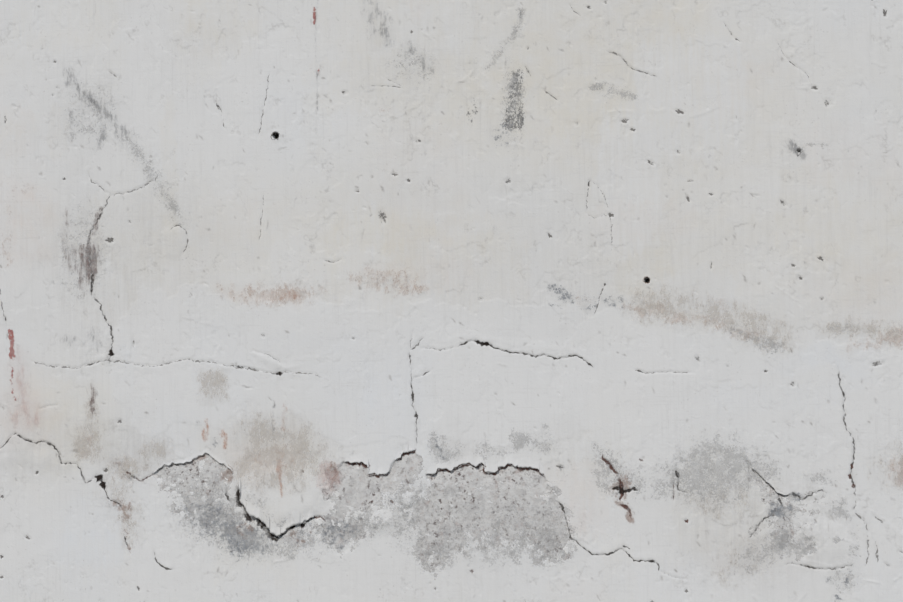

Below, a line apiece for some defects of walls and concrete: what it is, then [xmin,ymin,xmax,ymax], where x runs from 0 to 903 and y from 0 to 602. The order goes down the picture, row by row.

crack [35,178,311,375]
crack [409,340,593,438]
crack [2,433,119,504]
flaking render [152,441,576,577]
crack [602,456,638,516]
crack [750,470,823,537]
crack [793,374,881,570]